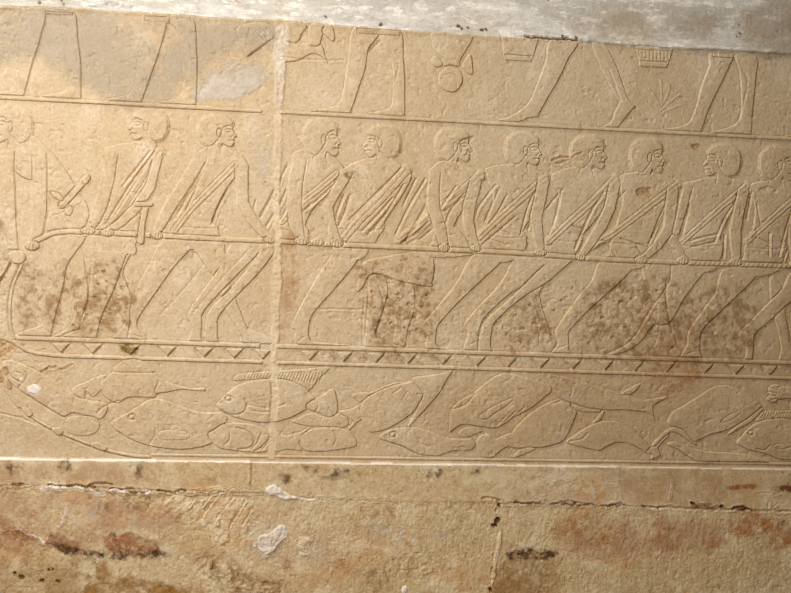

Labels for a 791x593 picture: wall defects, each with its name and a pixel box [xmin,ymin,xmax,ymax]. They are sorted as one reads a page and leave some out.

crack [0,463,261,545]
crack [482,476,791,528]